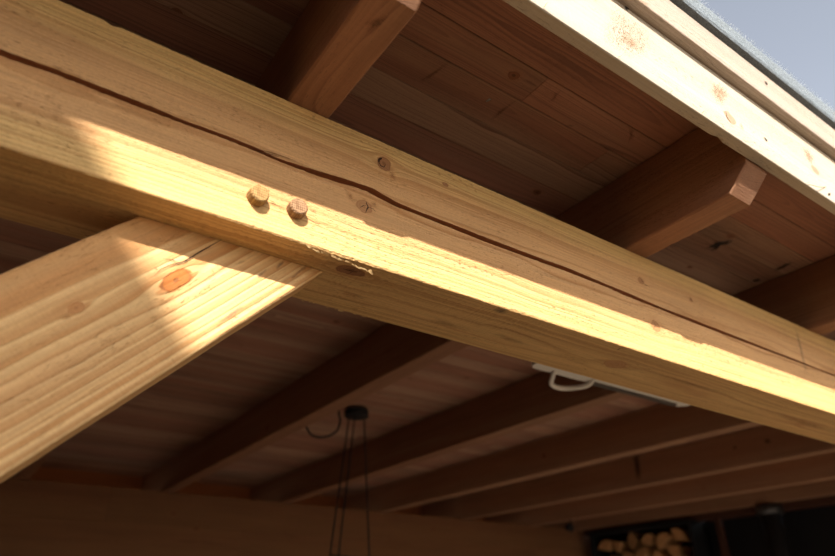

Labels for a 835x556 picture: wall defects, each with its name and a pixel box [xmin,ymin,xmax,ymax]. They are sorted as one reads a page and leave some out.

crack [0,49,835,376]